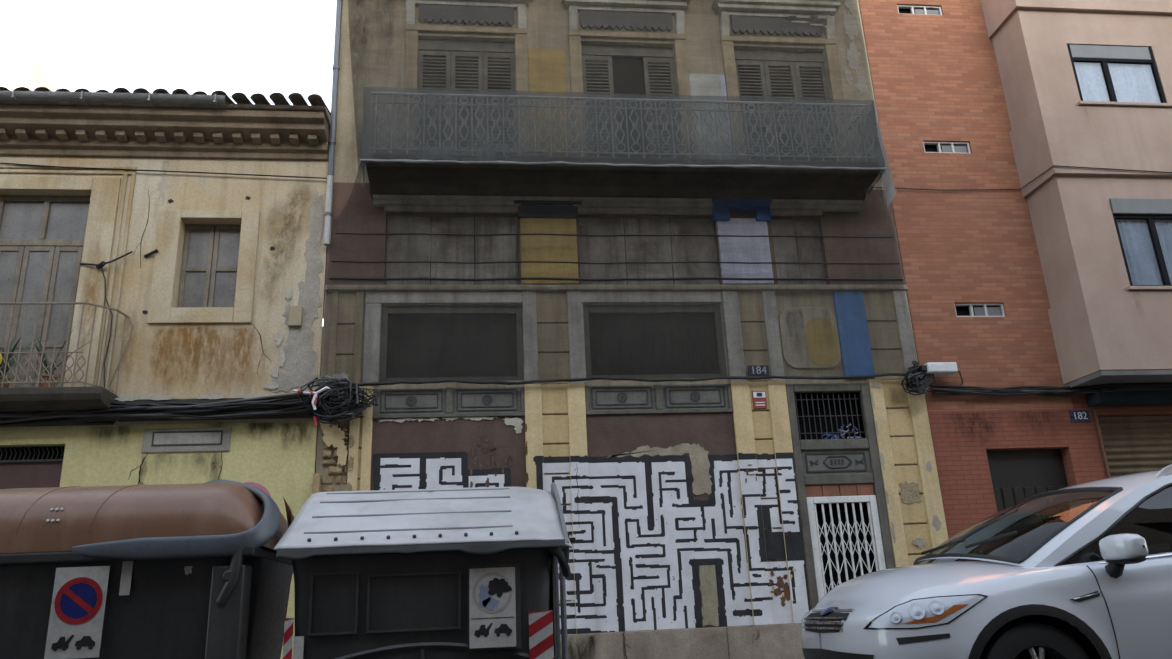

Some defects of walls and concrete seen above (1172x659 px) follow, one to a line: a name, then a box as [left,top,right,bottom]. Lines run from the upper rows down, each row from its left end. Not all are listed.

peeling [115,192,324,402]
flaking render [319,420,354,491]
flaking render [377,416,528,488]
flaking render [607,443,712,495]